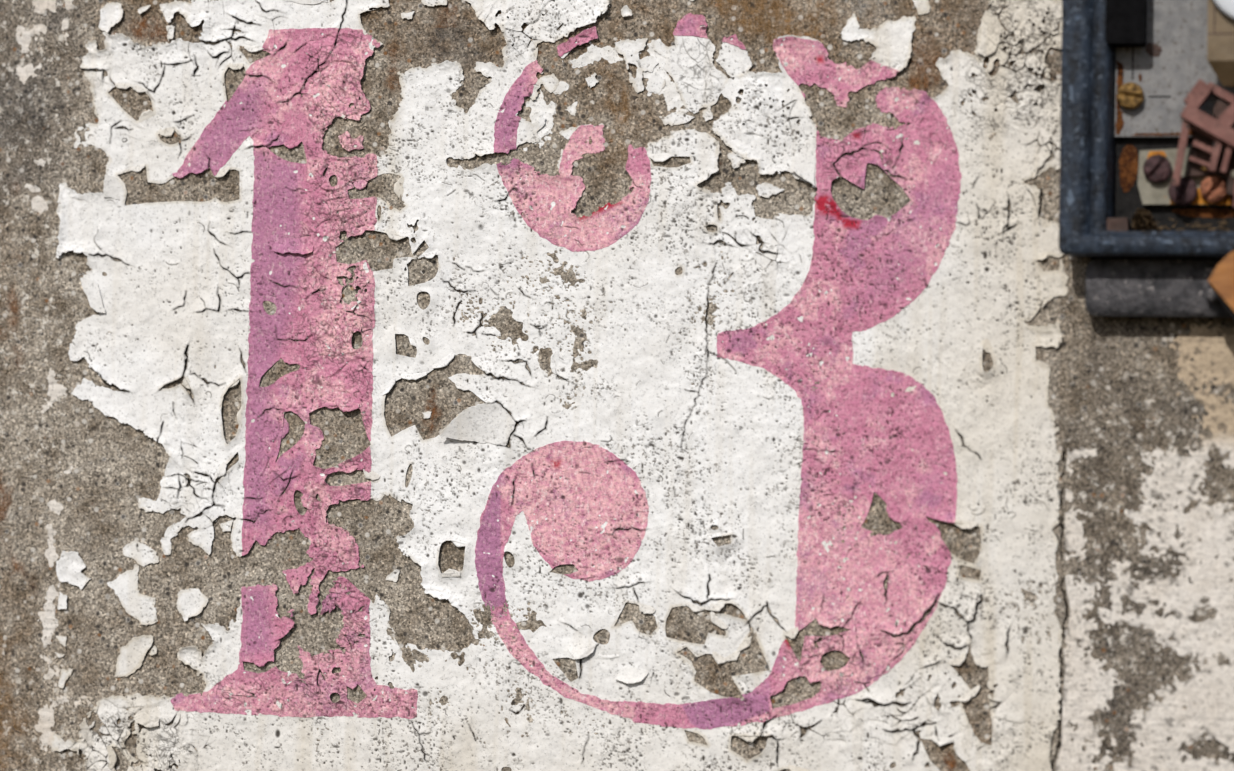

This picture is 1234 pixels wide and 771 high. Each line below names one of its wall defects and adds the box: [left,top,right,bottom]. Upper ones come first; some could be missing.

crack [142,3,274,93]
crack [248,0,347,103]
peeling [615,18,752,126]
peeling [118,164,240,205]
peeling [329,173,439,310]
peeling [215,373,245,486]
peeling [381,352,489,440]
peeling [107,539,159,677]
peeling [593,599,770,699]
peeling [949,643,995,745]
crack [1051,387,1083,771]
peeling [1056,296,1234,771]